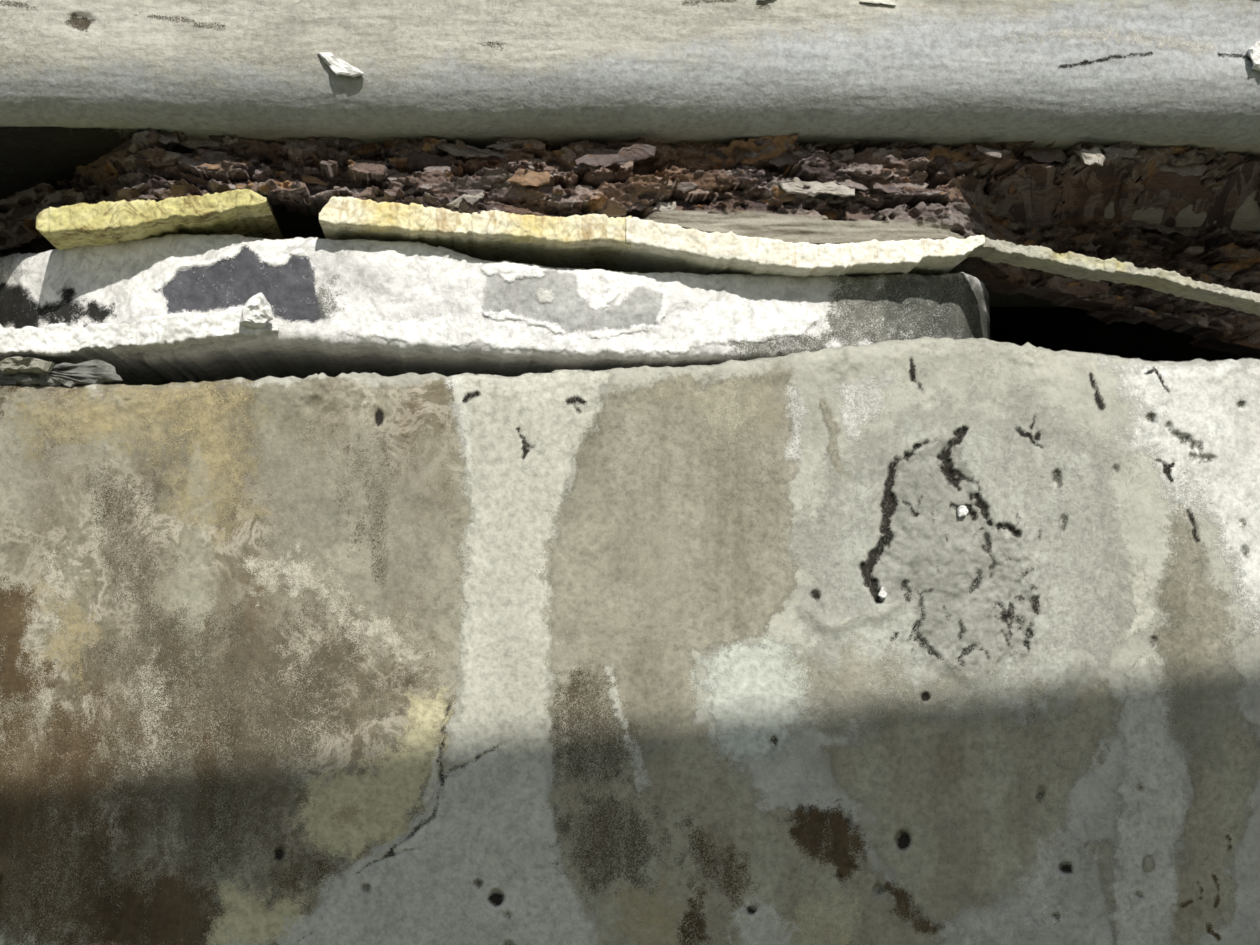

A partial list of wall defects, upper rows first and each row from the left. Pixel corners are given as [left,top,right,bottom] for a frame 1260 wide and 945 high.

water stain [134,0,263,31]
rust [575,143,656,167]
rust [976,145,1002,158]
rust [1073,146,1137,166]
rust [424,142,510,208]
rust [507,169,567,199]
rust [625,182,698,212]
rust [769,148,929,204]
water stain [0,253,117,329]
crack [1016,415,1043,449]